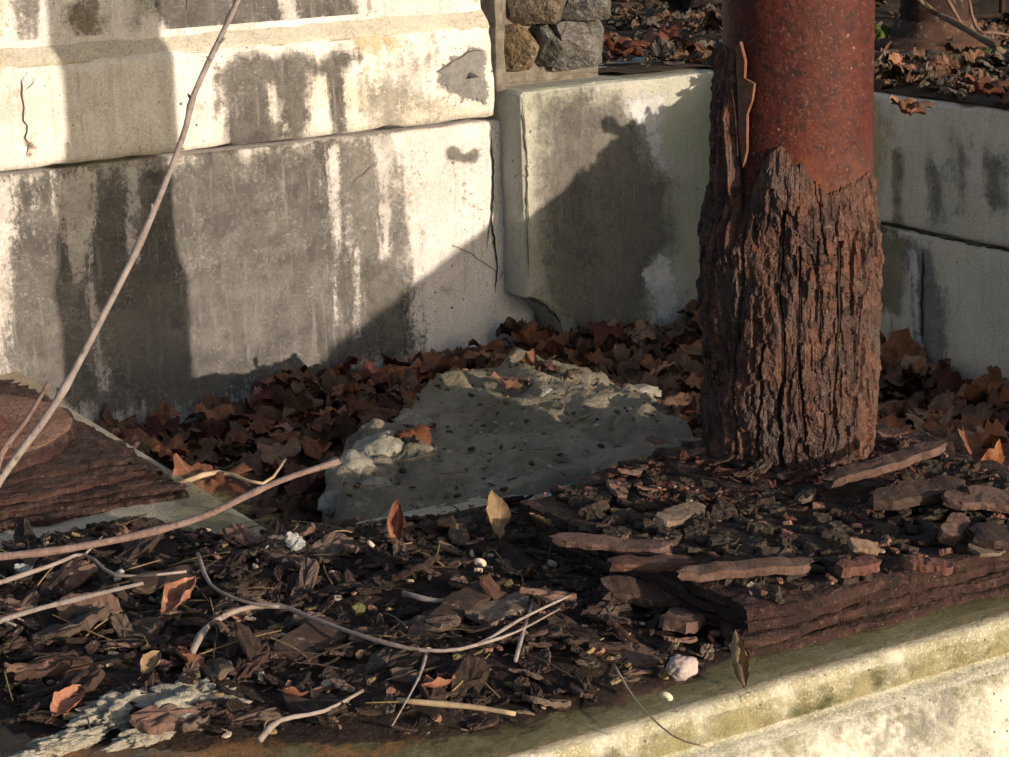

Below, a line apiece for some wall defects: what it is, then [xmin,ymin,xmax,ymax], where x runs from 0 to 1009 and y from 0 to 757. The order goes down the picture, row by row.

water stain [11,0,40,40]
water stain [62,0,103,35]
water stain [154,0,359,29]
crack [21,75,35,156]
spalling [438,47,490,106]
water stain [0,34,425,420]
crack [452,130,504,293]
crack [522,114,530,276]
water stain [538,90,683,332]
water stain [891,150,902,224]
water stain [982,147,1007,209]
water stain [907,243,947,363]